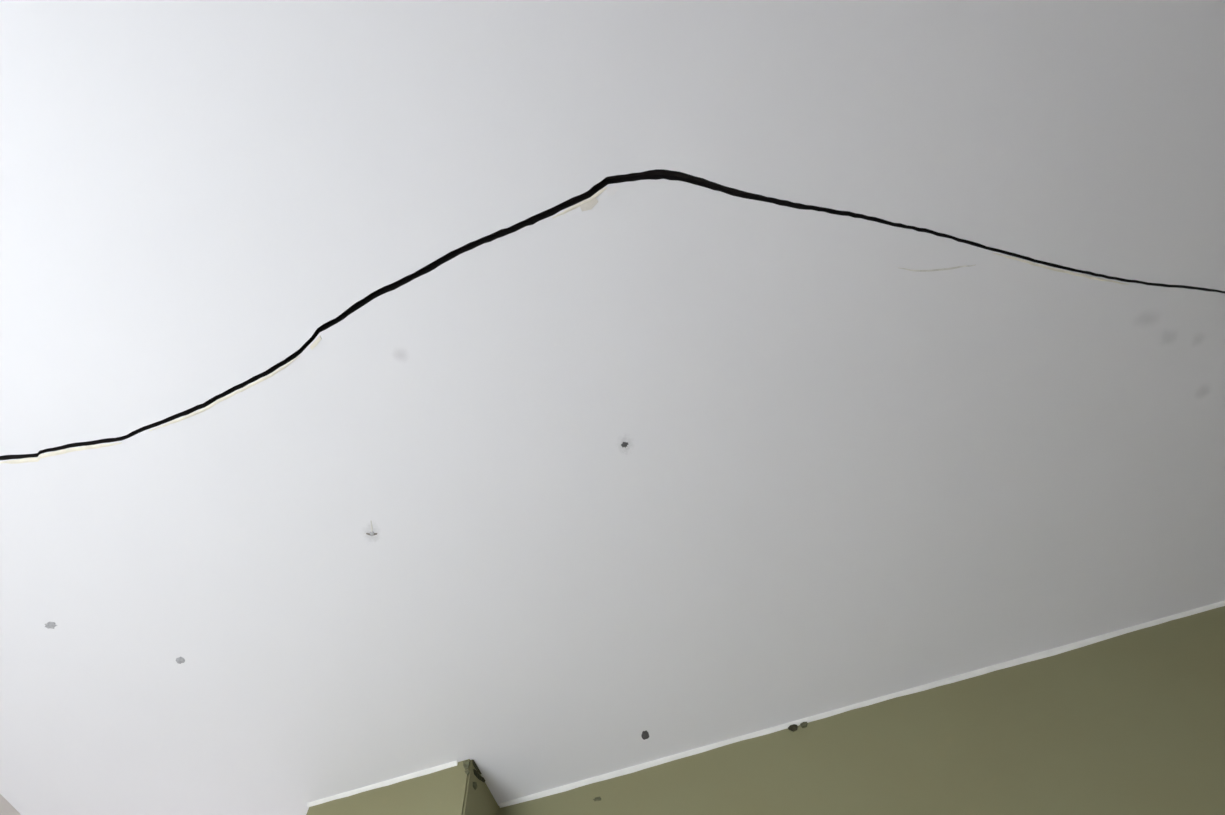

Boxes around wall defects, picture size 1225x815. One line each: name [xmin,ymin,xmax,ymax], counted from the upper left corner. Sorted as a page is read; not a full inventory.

crack [0,169,1225,464]